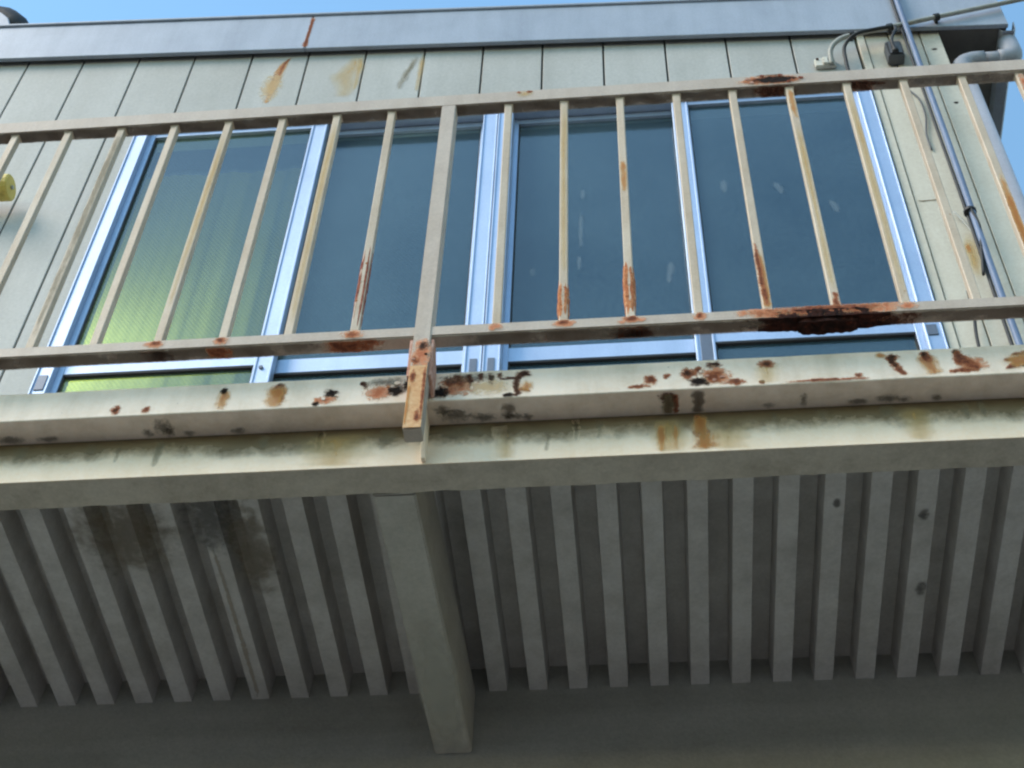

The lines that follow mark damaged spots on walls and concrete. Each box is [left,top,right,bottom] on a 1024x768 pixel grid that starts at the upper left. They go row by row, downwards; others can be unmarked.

rust [754,244,771,306]
rust [877,353,907,375]
rust [919,349,989,374]
rust [1004,351,1024,369]
rust [218,388,229,406]
rust [267,383,286,406]
rust [402,338,503,428]
rust [628,374,671,389]
rust [660,393,679,413]
rust [691,391,715,448]
leakage [428,396,1024,440]
leakage [0,424,404,462]